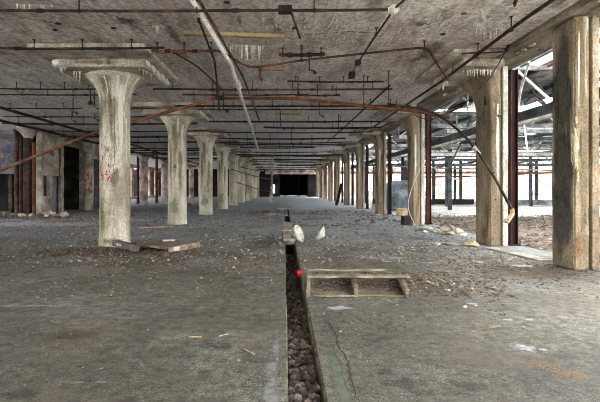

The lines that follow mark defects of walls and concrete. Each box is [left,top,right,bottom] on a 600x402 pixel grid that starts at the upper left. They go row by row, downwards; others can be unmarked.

efflorescence [223,44,263,60]
crack [328,322,359,399]